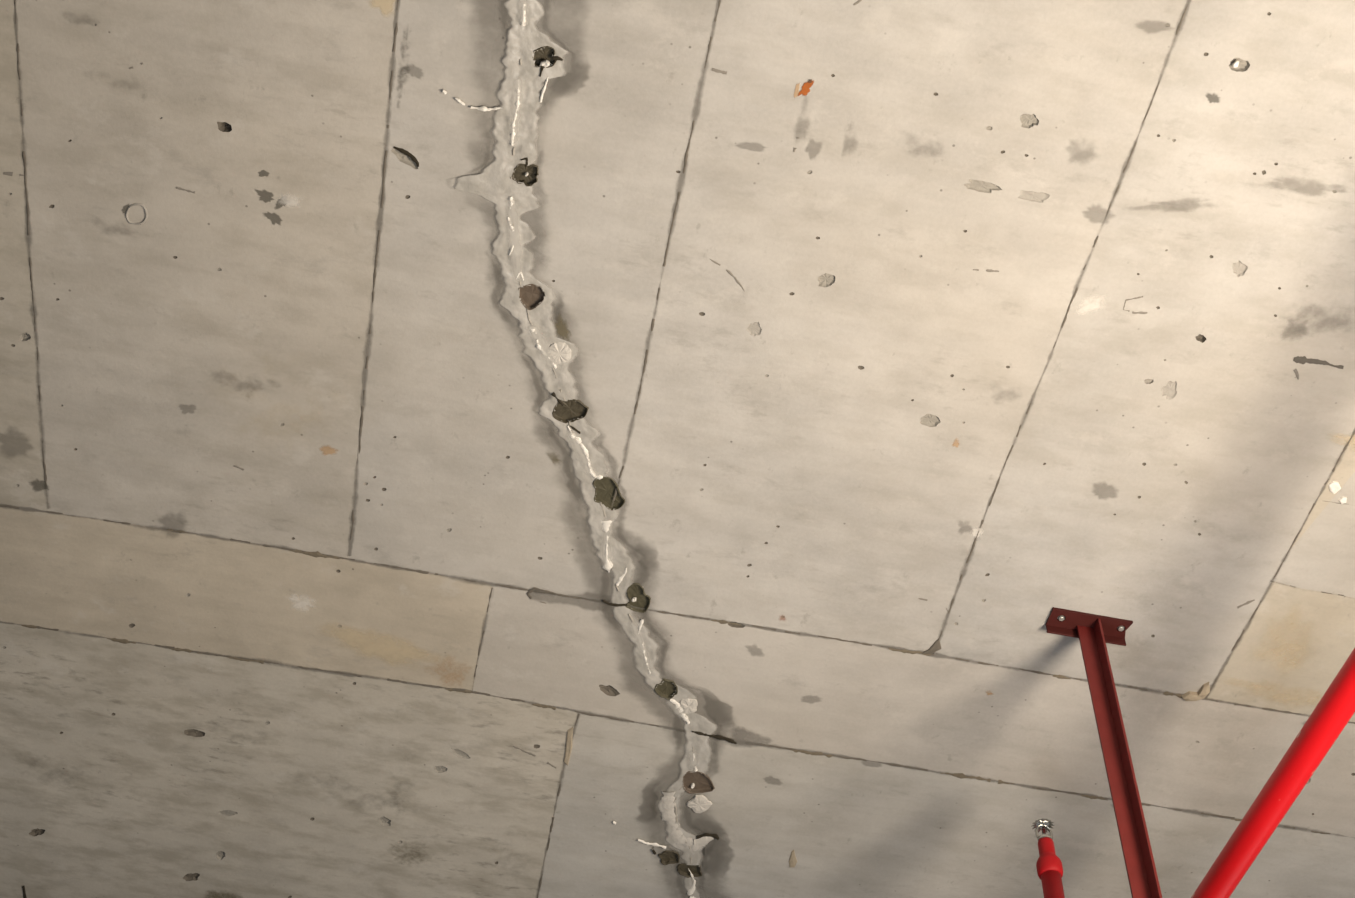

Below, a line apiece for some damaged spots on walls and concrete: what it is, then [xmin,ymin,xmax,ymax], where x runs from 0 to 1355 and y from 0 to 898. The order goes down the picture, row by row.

crack [442,0,737,898]
water stain [527,587,581,604]
water stain [733,730,753,745]